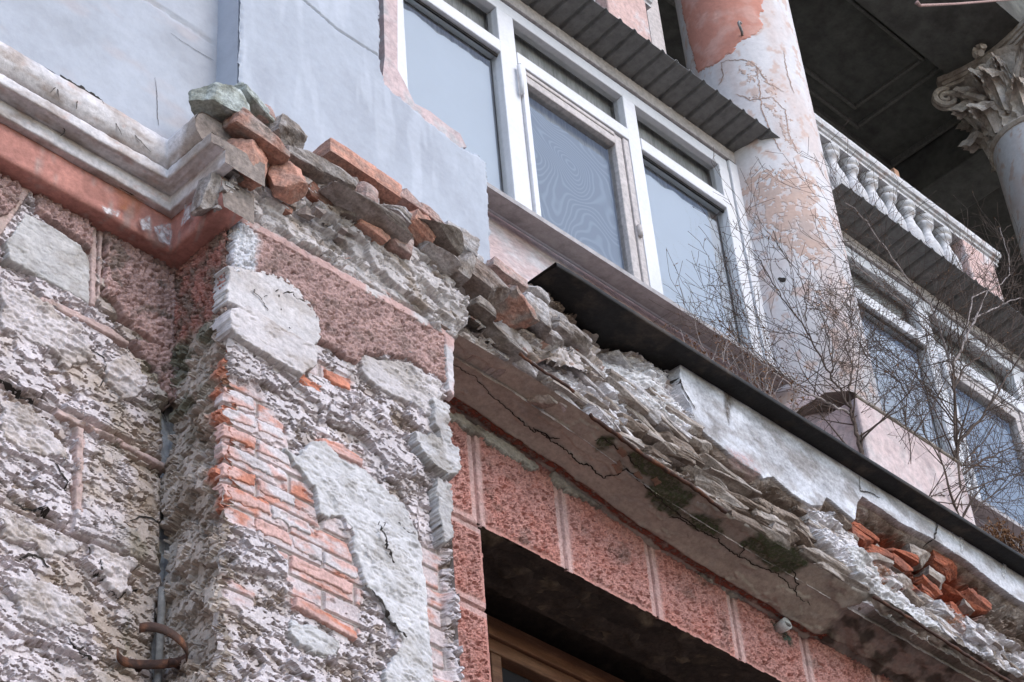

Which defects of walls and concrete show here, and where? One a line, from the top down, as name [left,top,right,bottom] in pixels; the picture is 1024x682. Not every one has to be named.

peeling [681,0,764,73]
peeling [0,174,180,413]
peeling [0,400,69,467]
peeling [9,577,88,630]
peeling [0,508,138,599]
peeling [210,182,826,682]
crack [453,360,811,606]
spalling [487,329,1024,680]